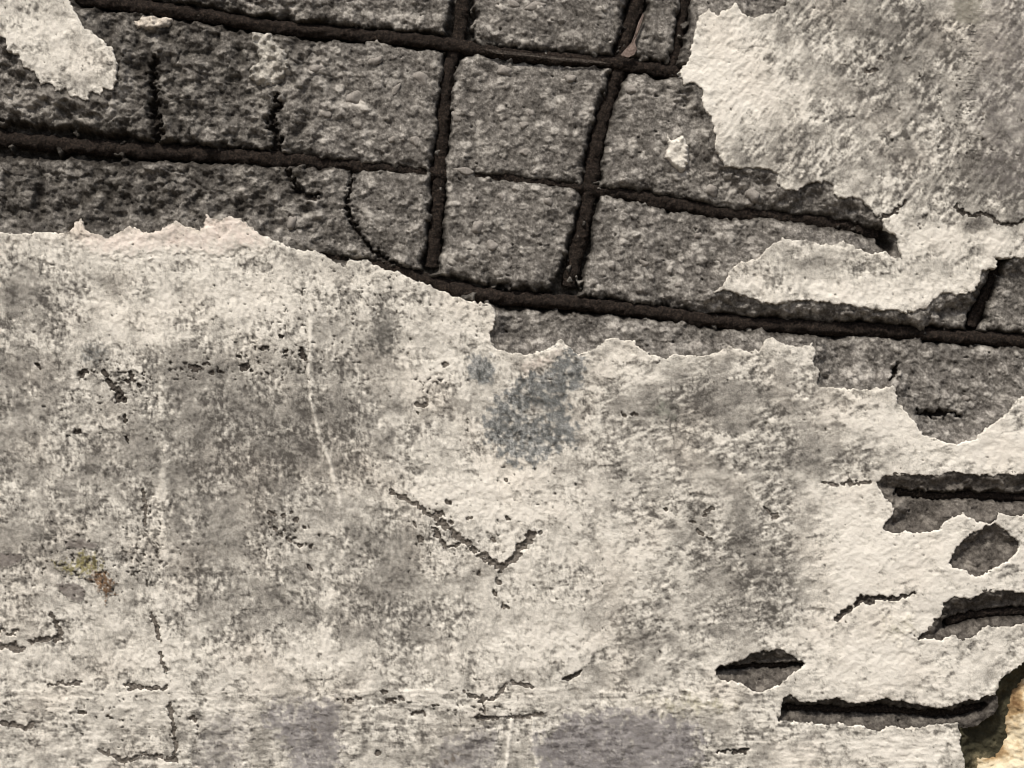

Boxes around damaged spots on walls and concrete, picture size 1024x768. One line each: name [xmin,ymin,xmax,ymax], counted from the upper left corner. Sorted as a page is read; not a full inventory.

spalling [0,0,1024,445]
crack [389,488,543,573]
hole [689,506,715,542]
spalling [876,471,1024,577]
crack [834,591,916,622]
spalling [918,589,1024,641]
spalling [716,649,999,732]